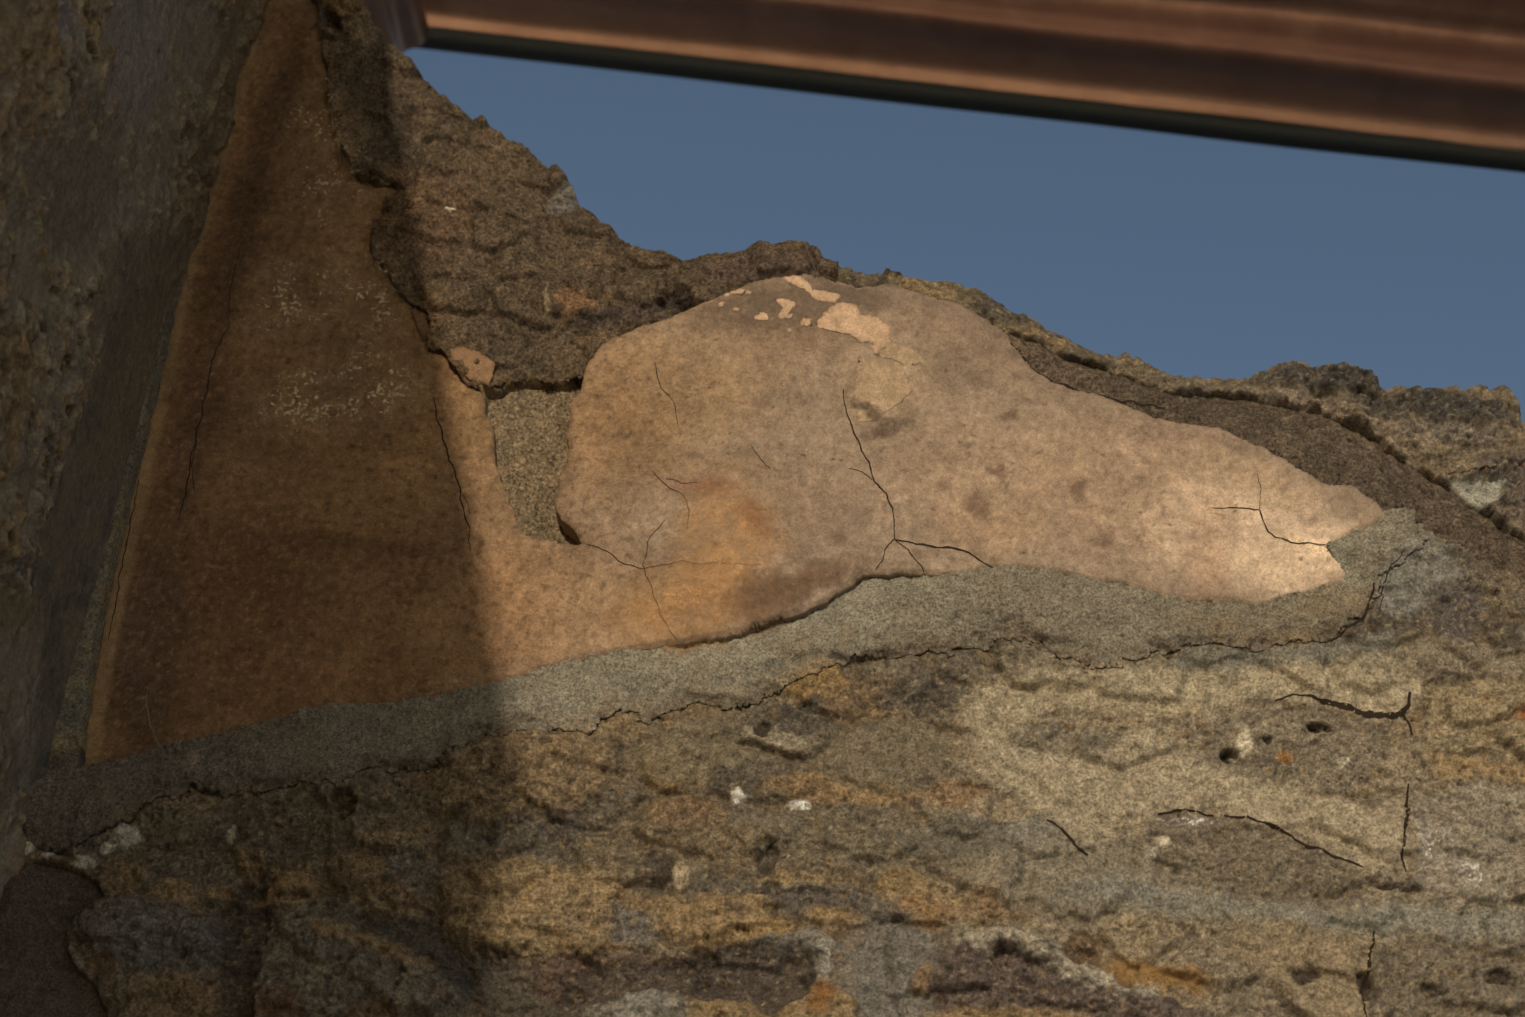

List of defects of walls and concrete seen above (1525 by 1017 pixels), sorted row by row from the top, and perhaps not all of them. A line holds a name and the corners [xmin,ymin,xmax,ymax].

spalling [317,0,924,545]
crack [433,397,471,551]
crack [843,389,993,576]
spalling [1009,334,1525,580]
crack [1213,473,1330,546]
crack [1330,548,1405,642]
crack [1275,691,1413,735]
crack [1158,808,1364,868]
crack [1401,784,1410,872]